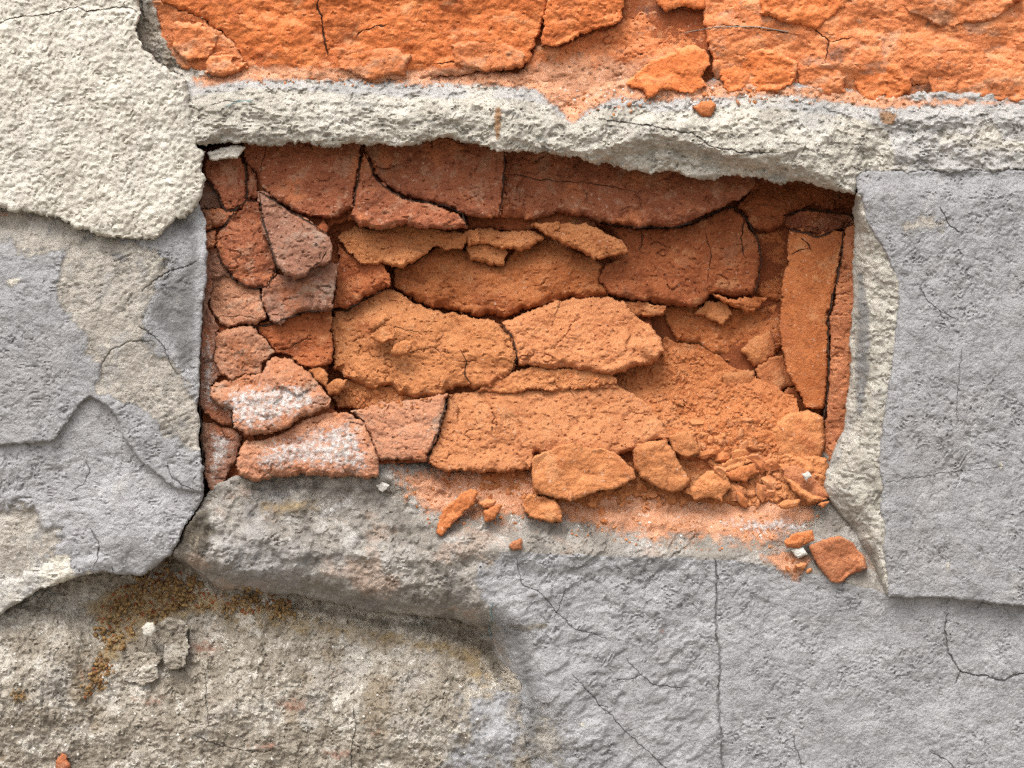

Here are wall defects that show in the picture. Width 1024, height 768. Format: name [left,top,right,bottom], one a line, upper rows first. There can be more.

peeling [151,0,912,100]
peeling [904,0,1022,28]
peeling [928,62,1024,103]
spalling [0,137,900,594]
crack [715,560,724,768]
crack [944,623,1024,682]